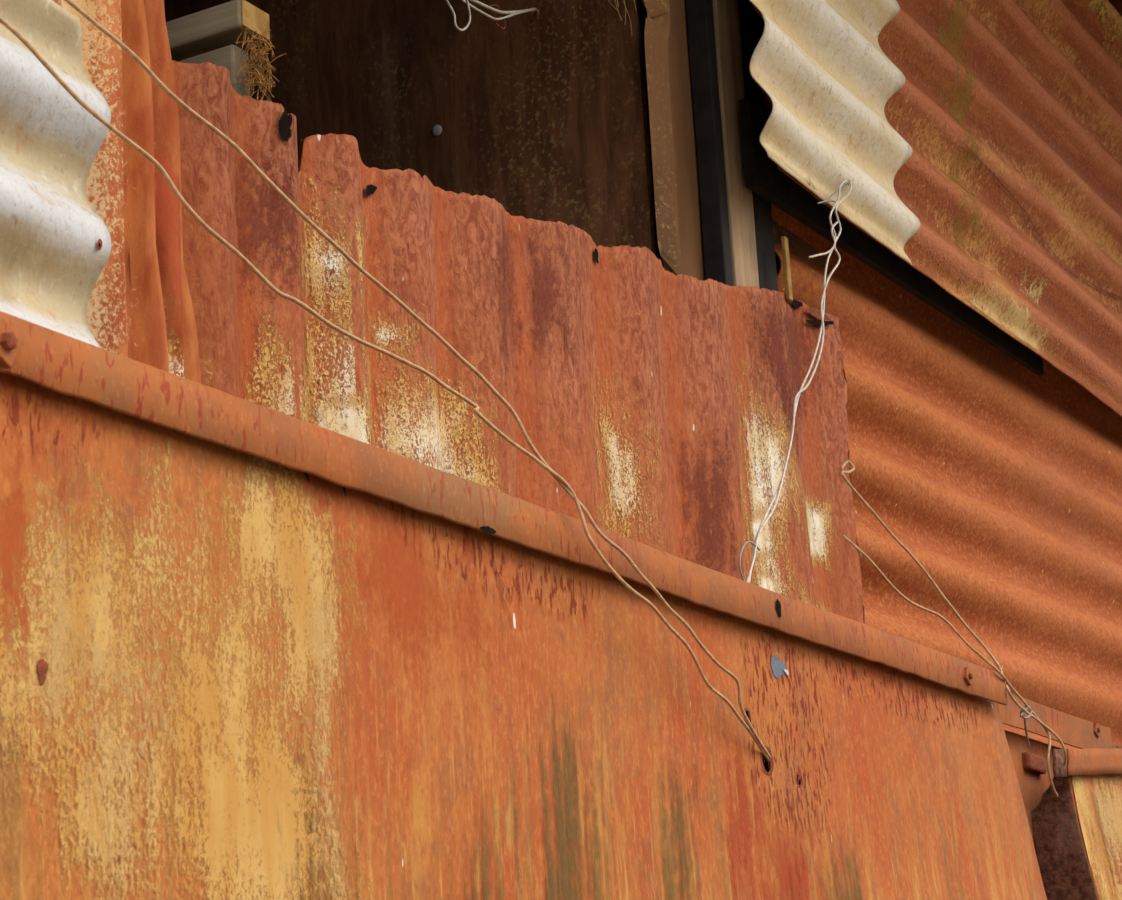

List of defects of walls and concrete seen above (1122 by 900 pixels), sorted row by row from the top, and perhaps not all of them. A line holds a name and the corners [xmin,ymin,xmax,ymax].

corrosion [155,162,183,339]
corrosion [236,159,299,288]
corrosion [497,216,574,378]
corrosion [752,300,821,453]
corrosion [672,432,738,573]